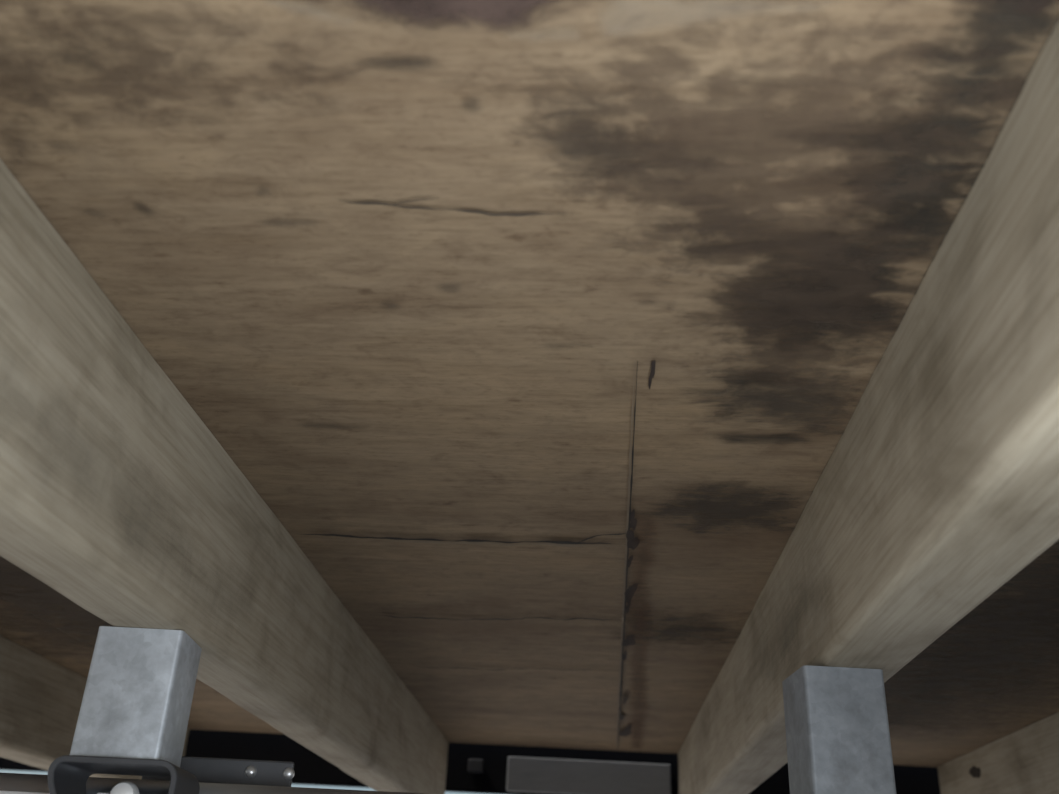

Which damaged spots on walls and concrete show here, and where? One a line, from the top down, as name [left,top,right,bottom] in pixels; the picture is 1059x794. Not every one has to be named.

crack [338,198,567,216]
damp [354,0,552,30]
damp [692,0,1057,352]
crack [300,360,656,748]